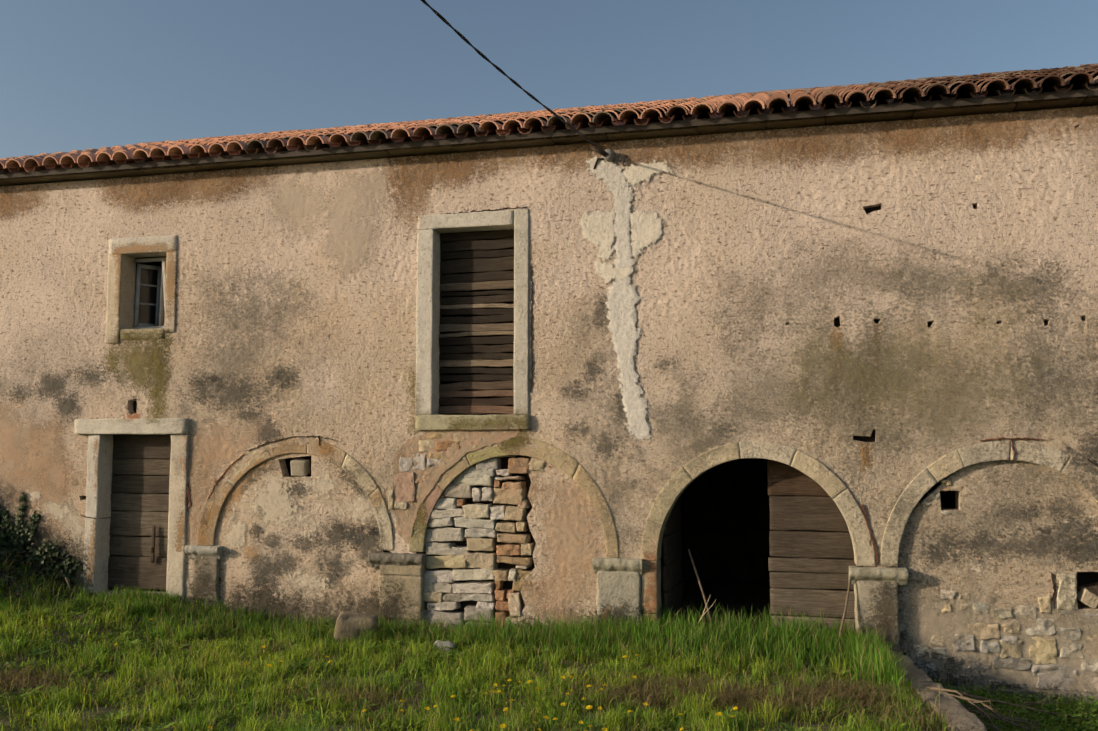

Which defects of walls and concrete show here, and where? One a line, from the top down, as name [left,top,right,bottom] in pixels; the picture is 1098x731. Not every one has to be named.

peeling [579,156,674,283]
damp [9,337,171,422]
damp [181,365,298,444]
peeling [178,424,258,537]
damp [279,480,311,513]
damp [327,460,371,501]
spalling [224,427,534,556]
spalling [911,479,963,515]
damp [189,506,426,628]
peeling [288,568,335,592]
spalling [898,558,1098,704]